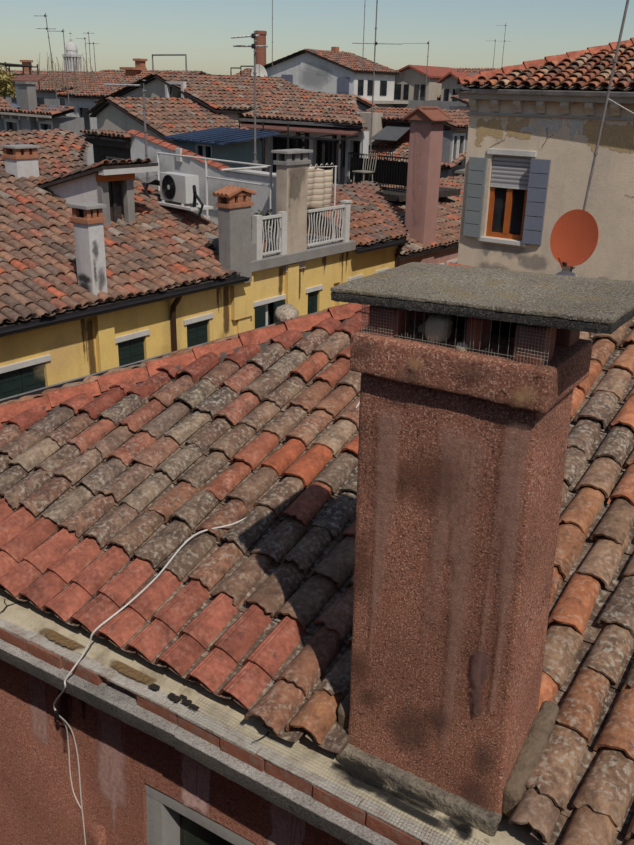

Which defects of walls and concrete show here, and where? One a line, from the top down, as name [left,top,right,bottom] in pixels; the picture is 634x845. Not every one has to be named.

peeling [475,117,531,146]
peeling [583,120,634,153]
water stain [78,274,90,291]